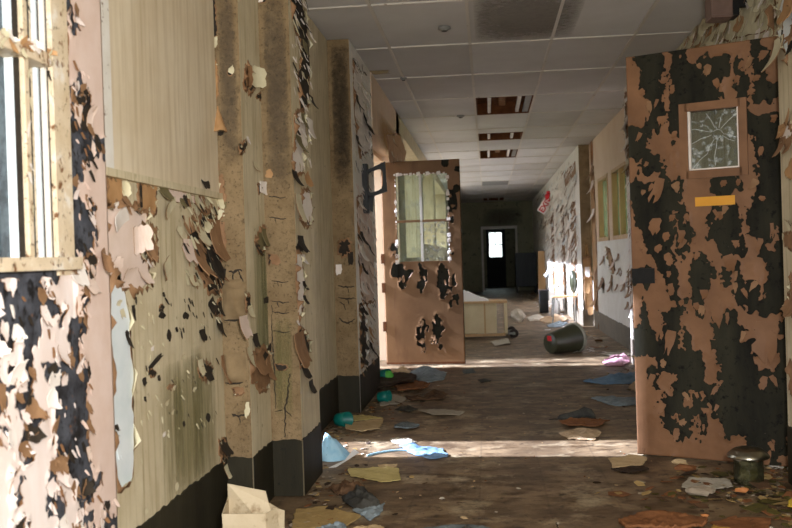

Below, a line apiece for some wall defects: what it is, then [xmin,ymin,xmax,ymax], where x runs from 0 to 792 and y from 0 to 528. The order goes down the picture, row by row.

water stain [480,0,574,37]
peeling [0,0,288,528]
crack [271,280,292,437]
peeling [304,384,425,524]
peeling [335,52,476,376]
peeling [535,0,792,520]